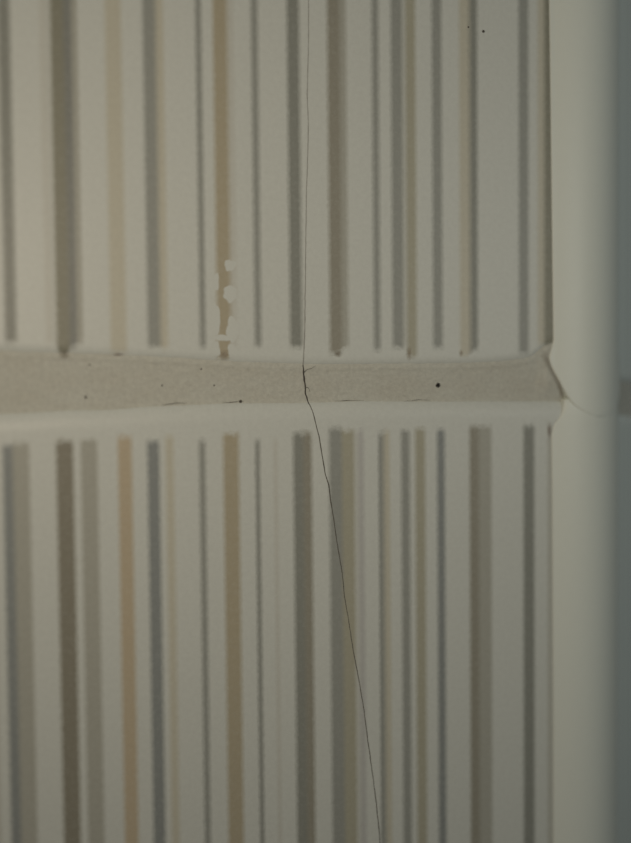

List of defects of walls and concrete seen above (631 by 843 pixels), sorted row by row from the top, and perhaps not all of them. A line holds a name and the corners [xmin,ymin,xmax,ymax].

crack [302,0,380,842]